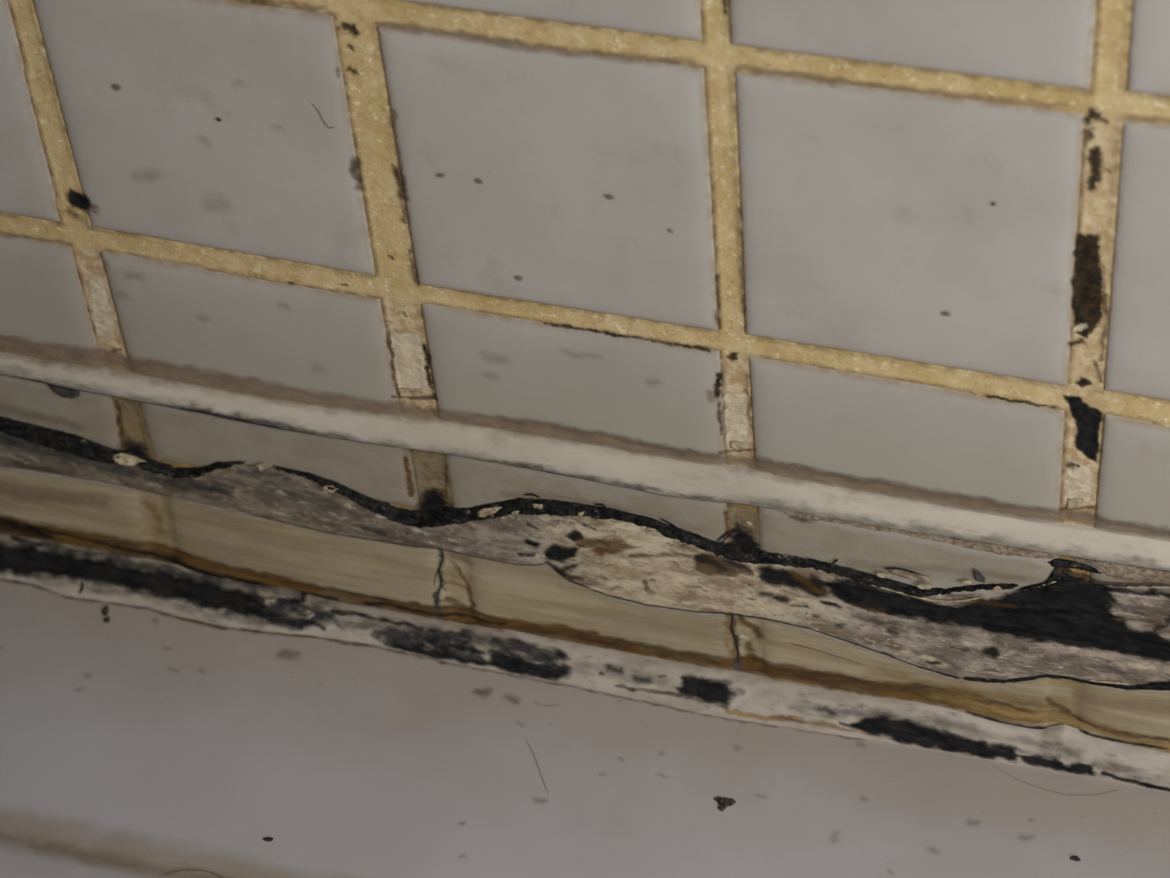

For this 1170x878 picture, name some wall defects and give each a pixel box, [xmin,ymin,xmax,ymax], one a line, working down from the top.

damp [1084,108,1109,191]
damp [544,323,710,352]
damp [987,234,1108,467]
peeling [47,384,80,399]
peeling [112,453,146,466]
peeling [477,507,519,517]
damp [0,373,1170,753]
crack [433,549,446,618]
peeling [959,569,1002,592]
peeling [592,587,769,612]
damp [818,707,1170,792]